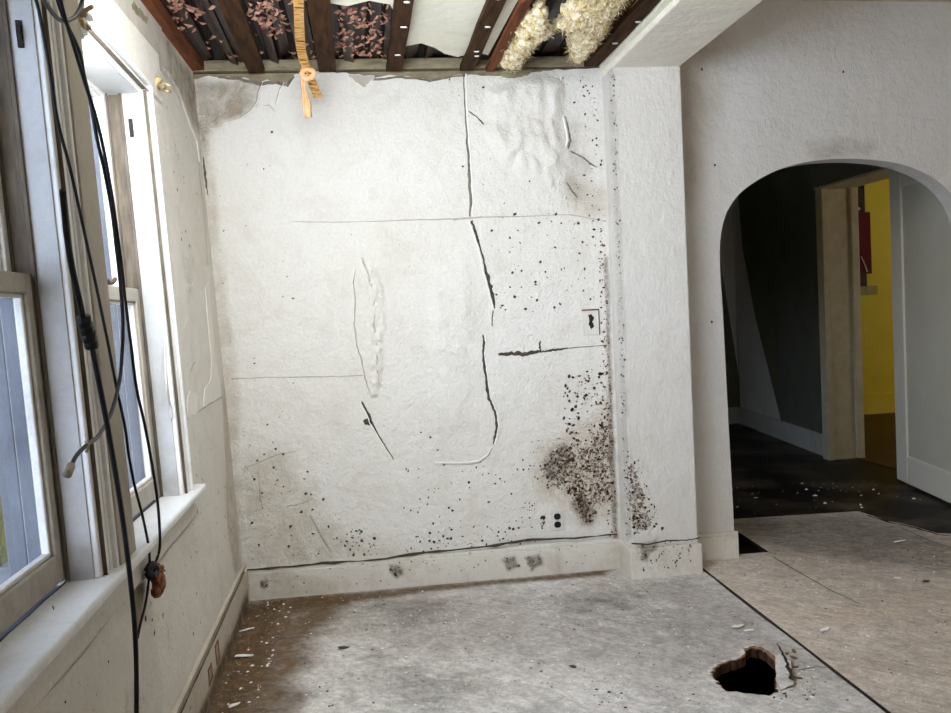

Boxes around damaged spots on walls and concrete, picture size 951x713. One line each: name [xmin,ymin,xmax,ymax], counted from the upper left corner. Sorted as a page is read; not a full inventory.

water stain [165,41,248,123]
crack [291,74,607,465]
water stain [475,362,616,523]
water stain [628,460,692,571]
water stain [190,502,607,713]